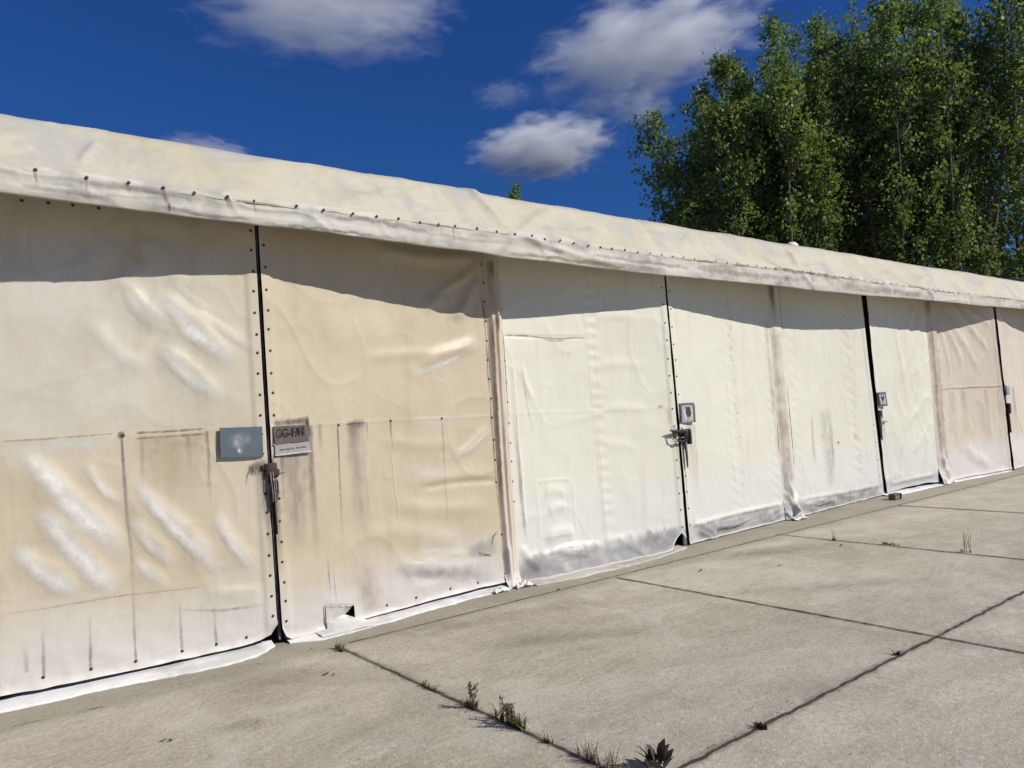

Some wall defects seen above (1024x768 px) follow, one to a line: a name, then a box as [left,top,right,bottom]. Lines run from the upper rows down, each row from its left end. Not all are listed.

leakage [138,428,209,449]